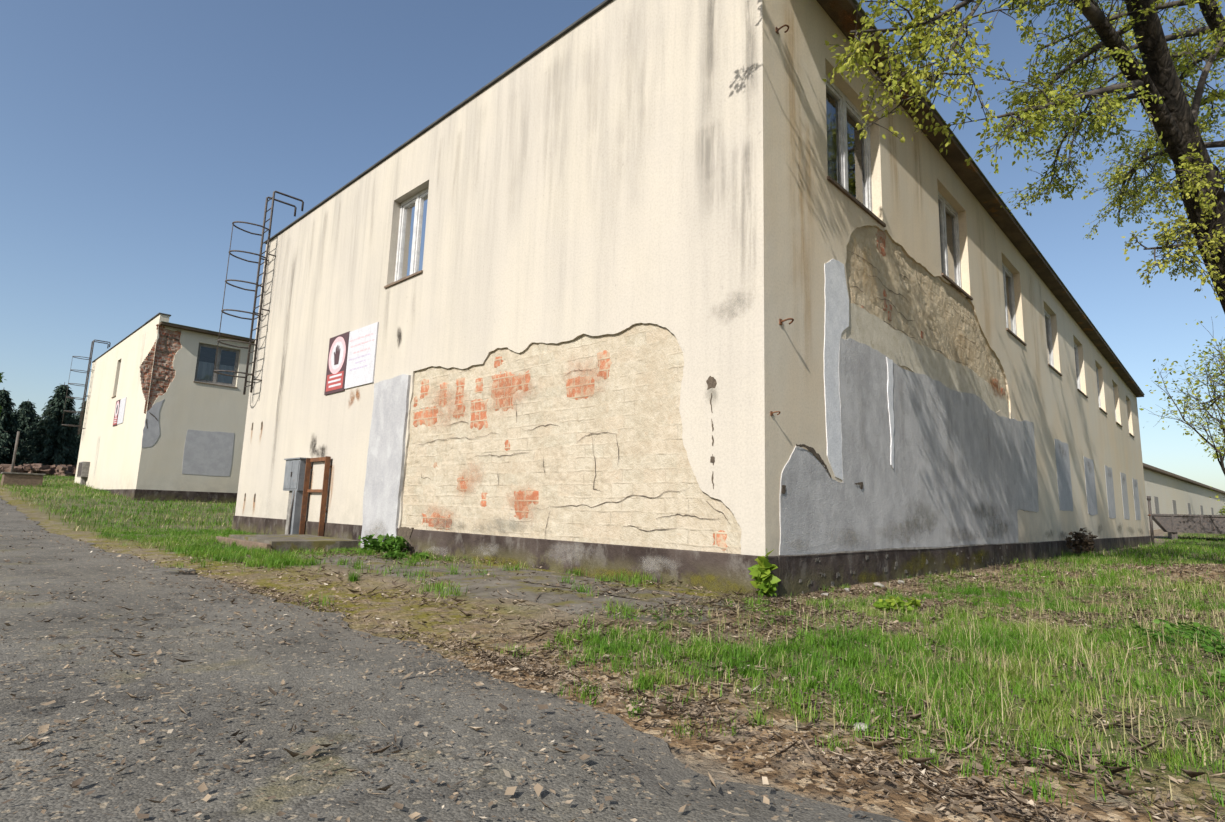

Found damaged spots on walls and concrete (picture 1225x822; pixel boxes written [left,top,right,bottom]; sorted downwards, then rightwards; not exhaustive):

flaking render [140,324,182,414]
flaking render [401,323,742,554]
flaking render [845,226,1009,418]